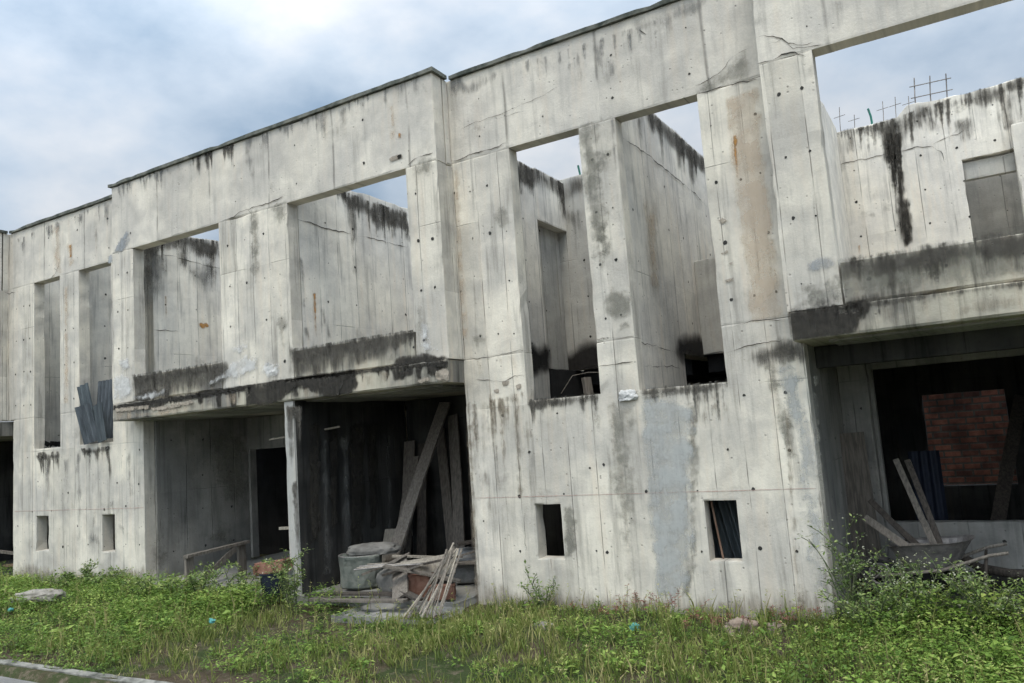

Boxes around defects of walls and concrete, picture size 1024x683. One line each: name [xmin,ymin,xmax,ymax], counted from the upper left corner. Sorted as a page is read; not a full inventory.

crack [697,35,819,93]
damp [337,192,410,239]
damp [518,150,599,220]
damp [592,212,607,253]
damp [757,78,1024,481]
damp [113,330,445,545]